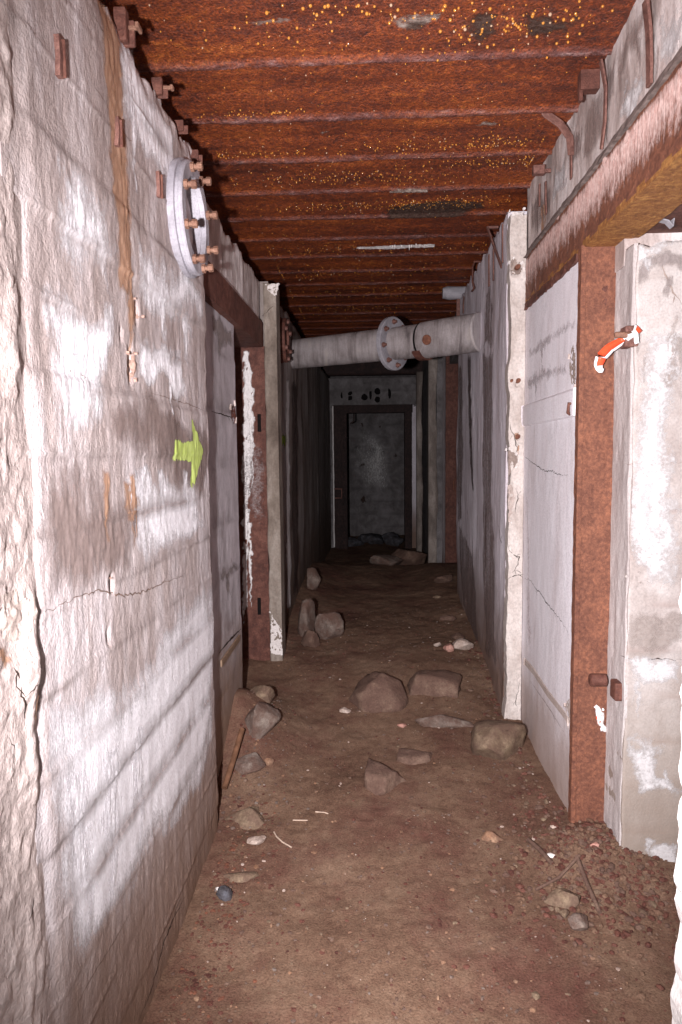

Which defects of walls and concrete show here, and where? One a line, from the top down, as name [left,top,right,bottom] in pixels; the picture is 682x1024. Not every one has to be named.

corrosion [97,1,134,351]
crack [45,577,180,612]
damp [221,351,260,615]